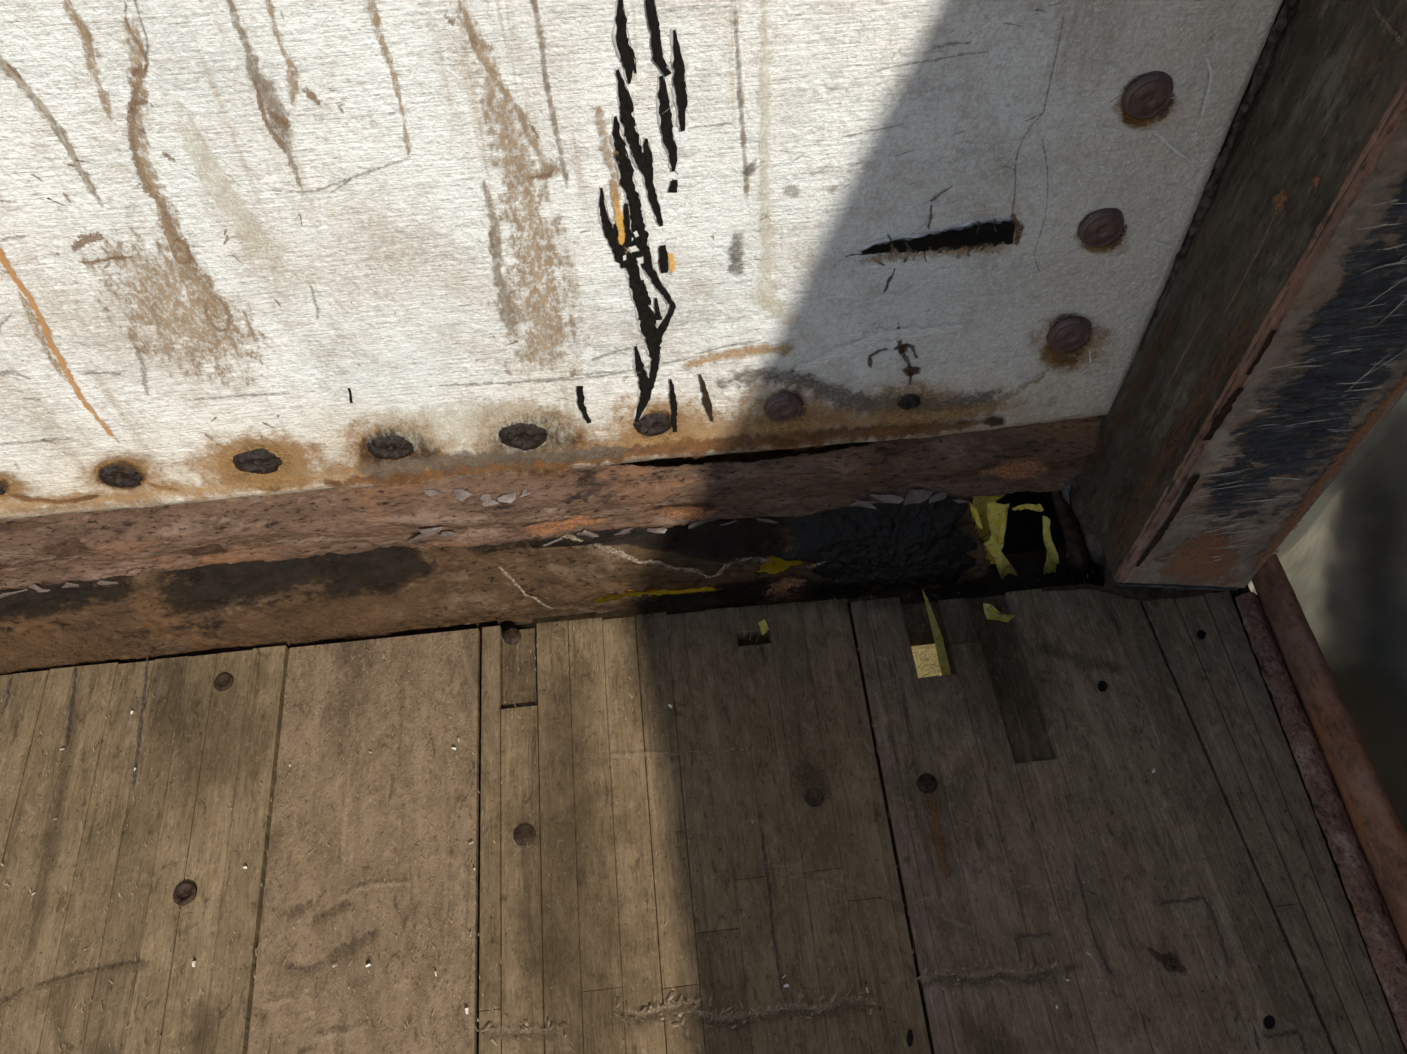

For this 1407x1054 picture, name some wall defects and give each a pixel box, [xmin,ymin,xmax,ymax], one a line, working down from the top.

damp [71,230,267,385]
rust [124,0,234,337]
damp [444,0,578,376]
crack [597,0,714,432]
rust [1078,212,1127,253]
rust [1117,74,1175,128]
rust [0,249,1005,532]
rust [181,545,228,558]
damp [317,546,436,599]
rust [409,526,458,543]
rust [526,507,737,546]
rust [1162,373,1407,586]